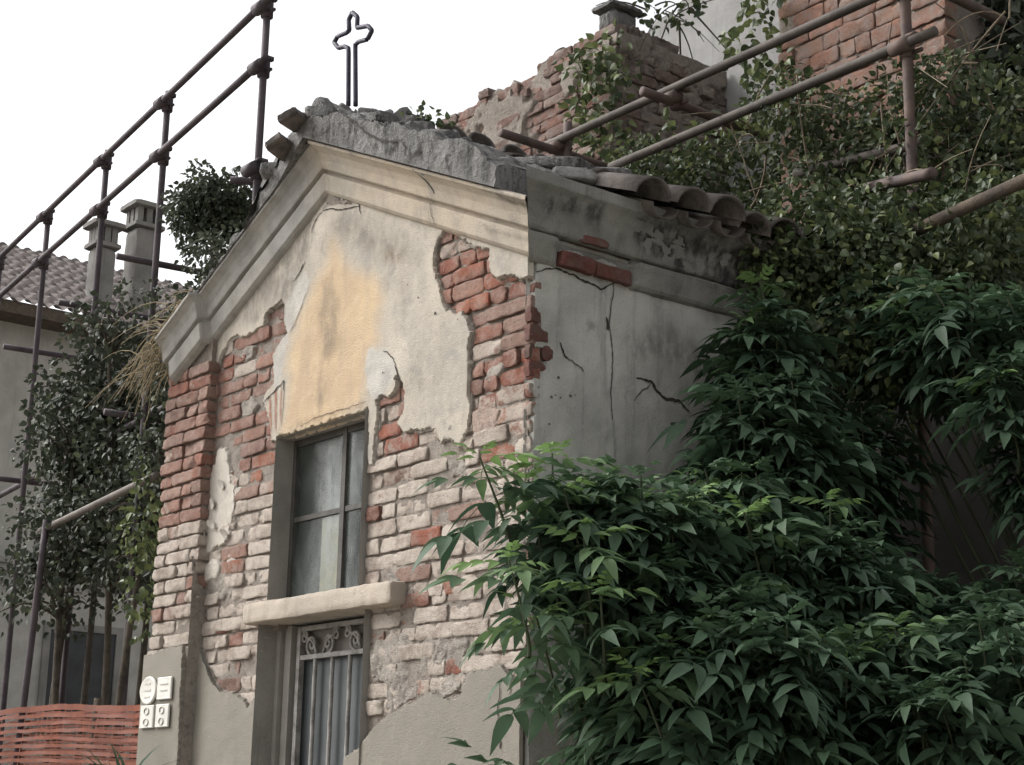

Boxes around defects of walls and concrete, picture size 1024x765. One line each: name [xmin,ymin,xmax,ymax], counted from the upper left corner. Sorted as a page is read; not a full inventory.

spalling [147,300,287,706]
spalling [364,232,572,722]
spalling [556,235,632,287]
crack [536,267,689,419]